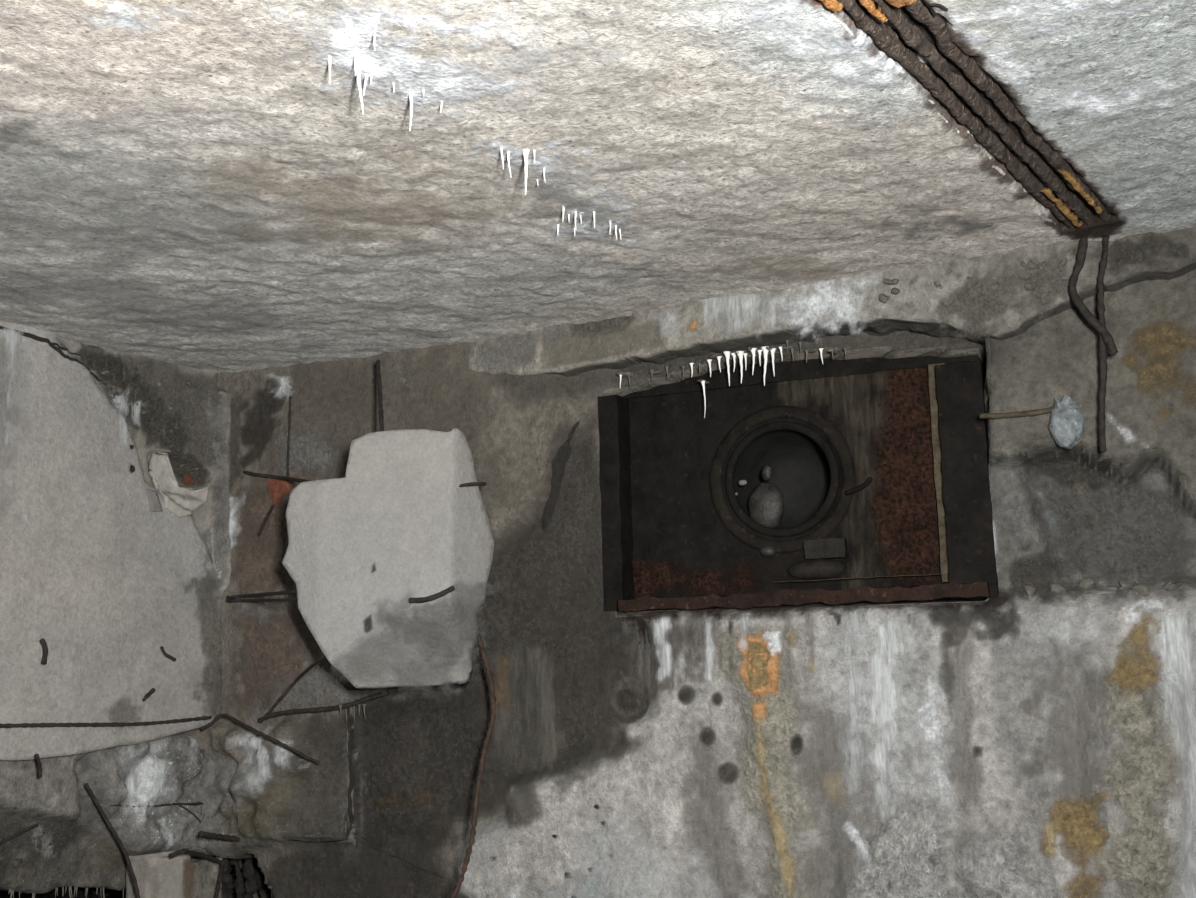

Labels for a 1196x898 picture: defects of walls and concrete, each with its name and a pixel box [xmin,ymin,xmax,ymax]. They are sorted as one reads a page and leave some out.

water stain [308,8,520,130]
corrosion [817,0,1125,239]
water stain [470,139,633,248]
crack [0,326,111,389]
spalling [243,396,310,483]
spalling [376,360,384,432]
water stain [507,279,1006,418]
corrosion [1110,616,1159,694]
corrosion [618,592,1012,892]
water stain [1125,600,1196,898]
spalling [84,783,140,898]
corrosion [1041,792,1109,898]